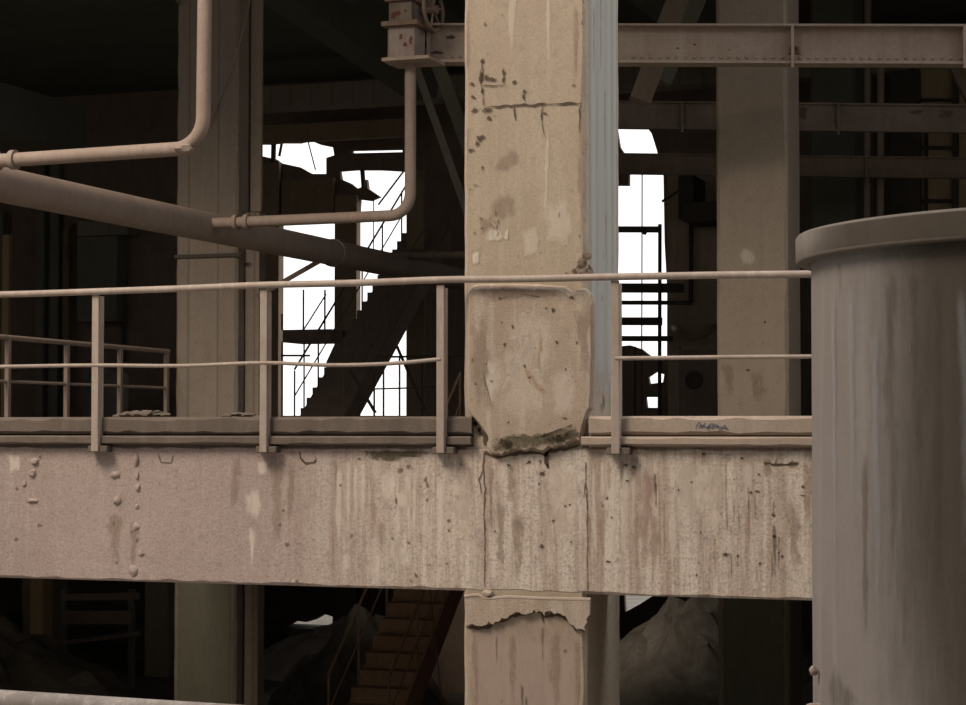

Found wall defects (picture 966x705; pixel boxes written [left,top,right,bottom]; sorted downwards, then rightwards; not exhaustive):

crack [481,60,582,134]
water stain [366,450,426,461]
crack [473,421,588,590]